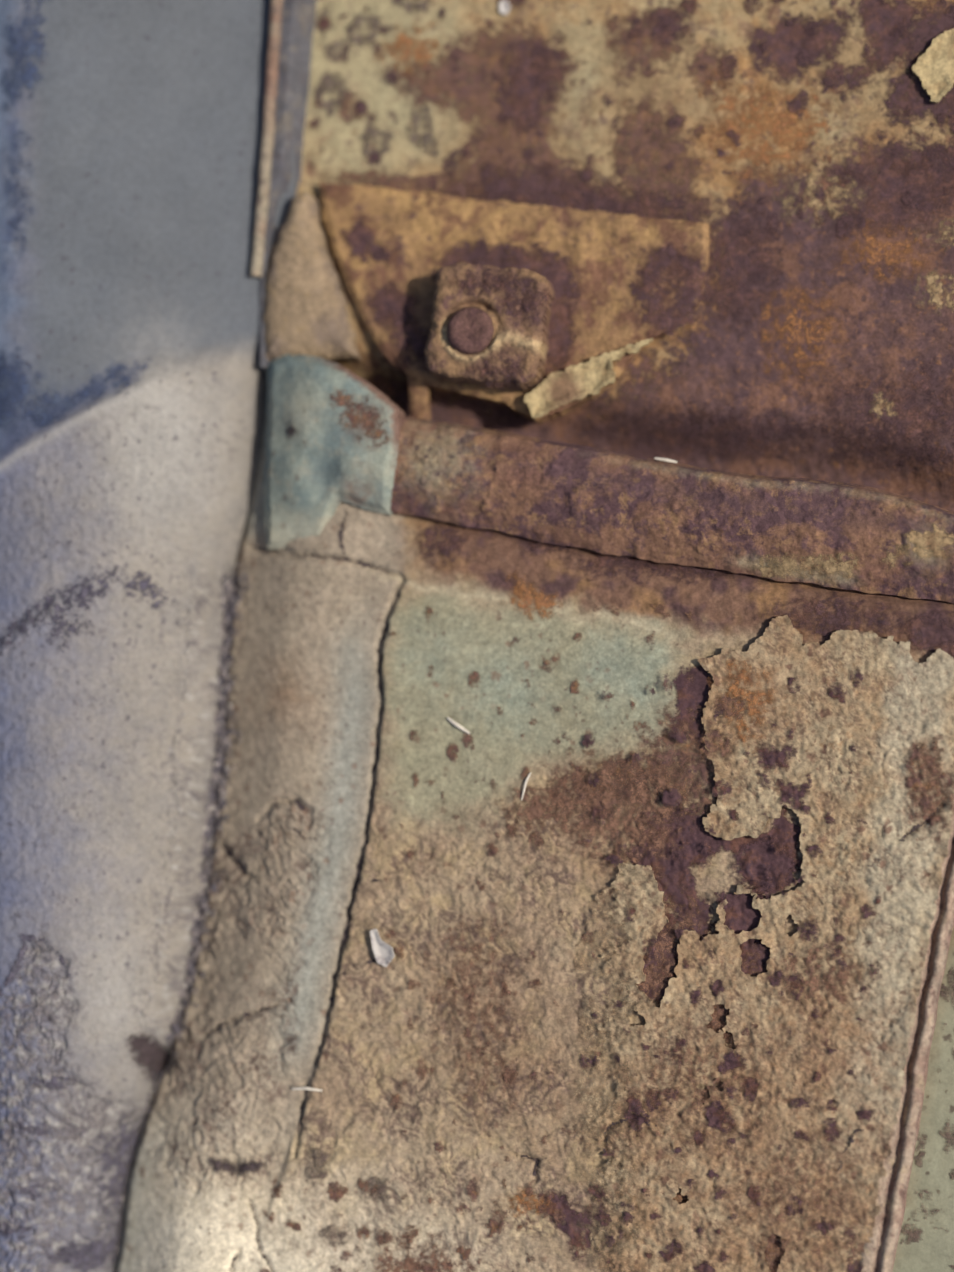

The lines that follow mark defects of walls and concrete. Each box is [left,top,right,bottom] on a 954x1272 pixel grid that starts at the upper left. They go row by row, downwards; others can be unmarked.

peeling [912,28,954,103]
corrosion [310,0,954,512]
water stain [0,348,147,441]
peeling [524,338,654,419]
corrosion [763,591,954,657]
corrosion [486,662,812,857]
crack [258,512,399,1155]
peeling [510,615,954,1272]
corrosion [620,979,811,1154]
crack [229,1204,273,1272]
corrosion [307,1148,481,1272]
corrosion [686,1130,863,1272]